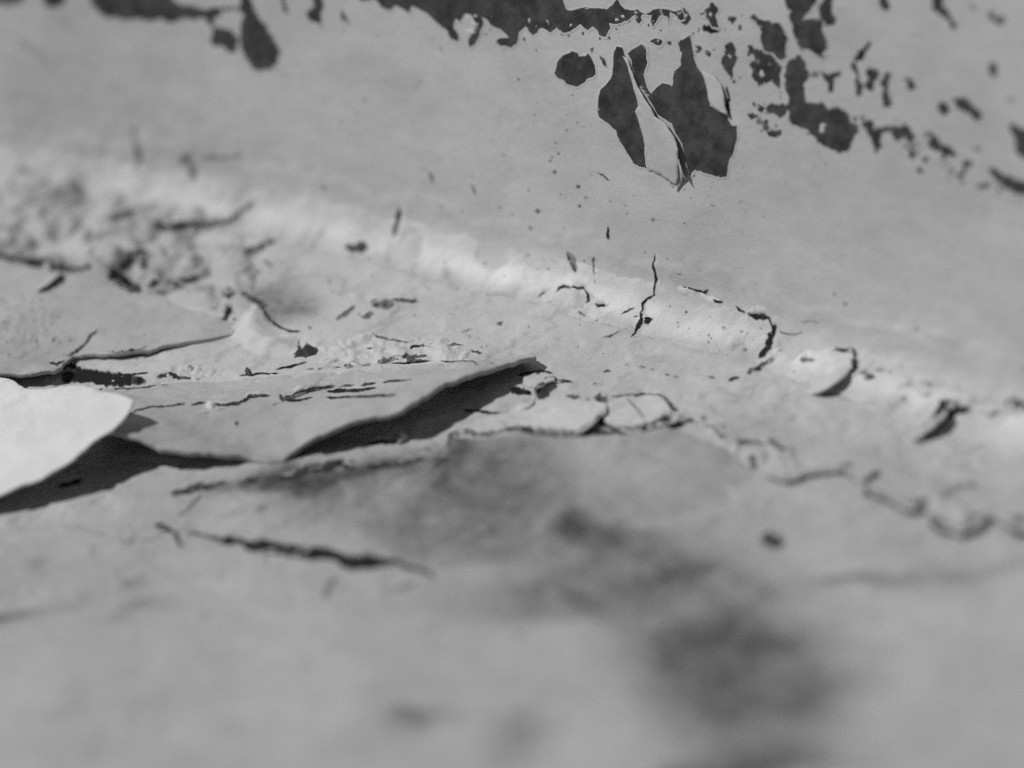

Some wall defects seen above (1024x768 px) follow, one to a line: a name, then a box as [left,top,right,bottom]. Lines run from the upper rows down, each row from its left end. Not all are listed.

peeling [44,0,65,8]
peeling [91,0,283,73]
peeling [307,0,324,28]
peeling [358,0,1024,201]
crack [539,227,870,381]